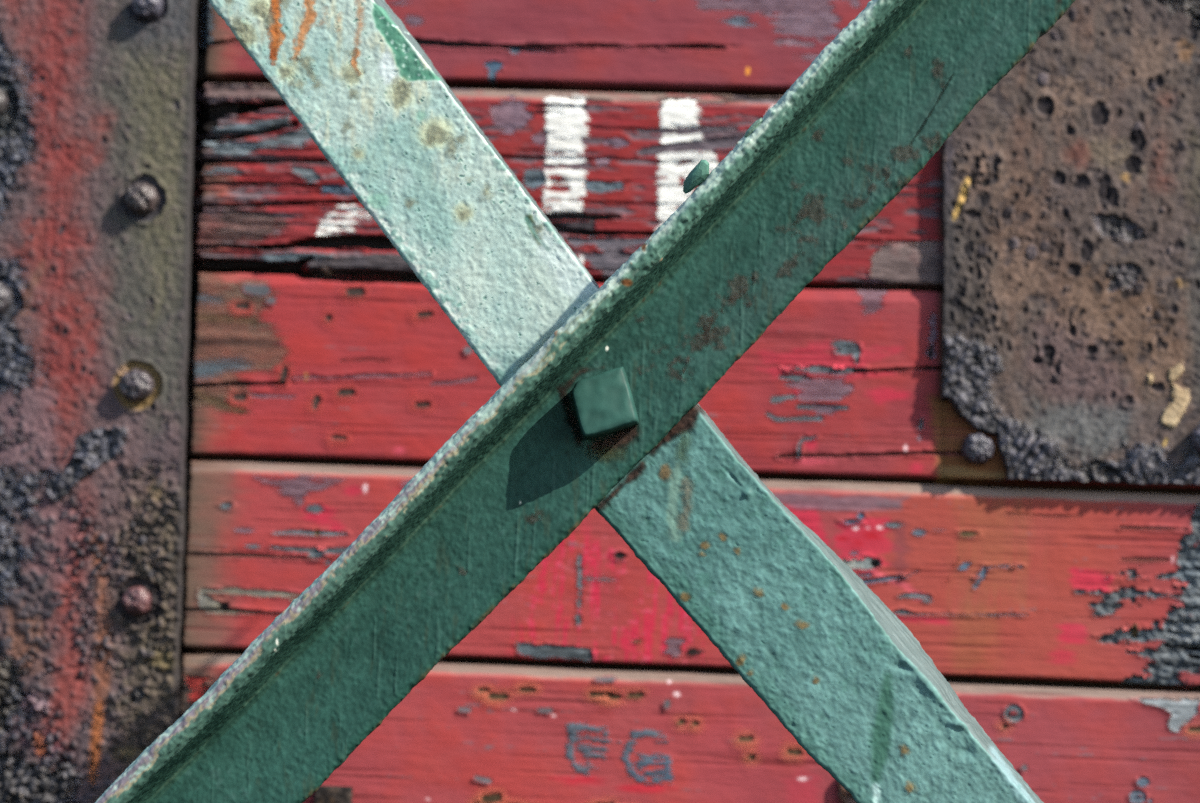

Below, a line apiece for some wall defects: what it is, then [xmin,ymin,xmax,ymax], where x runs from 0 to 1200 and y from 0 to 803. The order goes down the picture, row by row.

corrosion [269,0,316,60]
peeling [696,0,842,61]
corrosion [0,32,41,222]
crack [191,159,360,212]
corrosion [1091,214,1146,242]
corrosion [0,257,35,397]
corrosion [943,336,1200,484]
corrosion [0,427,128,606]
peeling [1074,503,1200,733]
corrosion [0,652,102,803]
corrosion [129,686,145,704]
peeling [1130,778,1152,803]